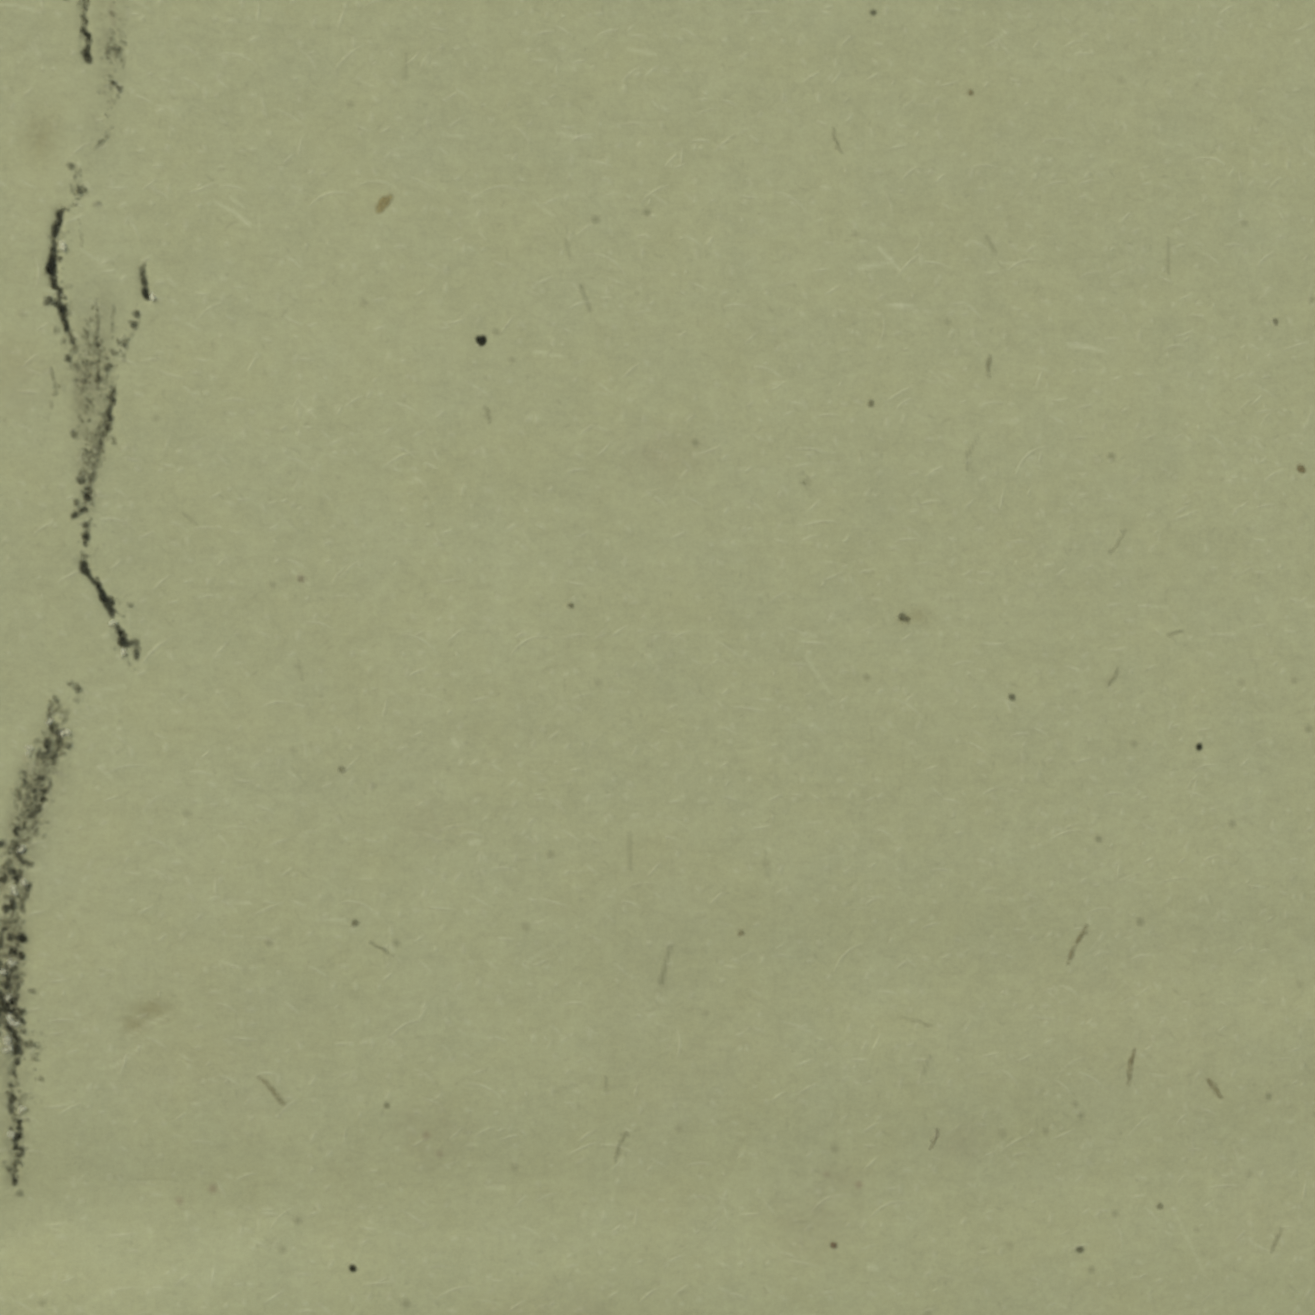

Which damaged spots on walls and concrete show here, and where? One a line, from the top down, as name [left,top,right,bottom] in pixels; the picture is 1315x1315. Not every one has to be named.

crack [82,16,91,62]
crack [46,210,73,360]
crack [135,271,154,315]
crack [99,366,113,429]
crack [72,478,135,654]
crack [0,719,69,1182]